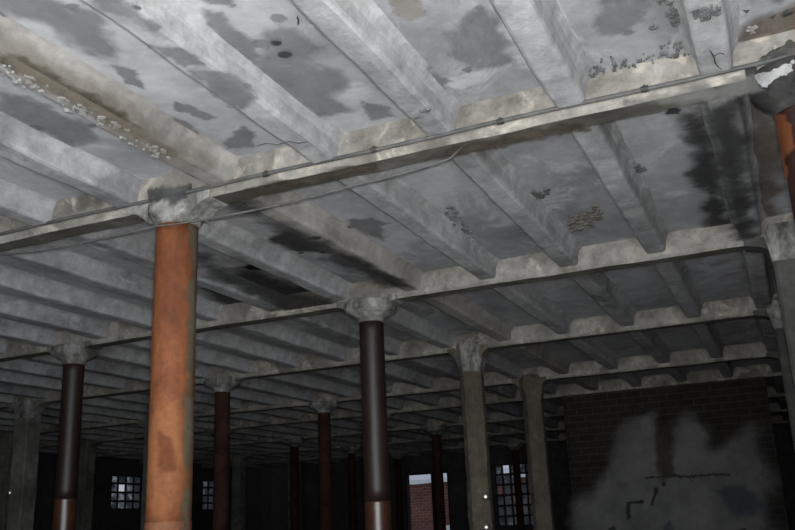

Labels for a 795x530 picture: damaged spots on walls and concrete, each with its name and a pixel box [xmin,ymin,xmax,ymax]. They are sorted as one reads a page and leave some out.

damp [0,0,161,55]
damp [112,66,143,88]
damp [149,46,254,109]
damp [205,0,347,115]
damp [391,0,423,19]
damp [453,5,512,72]
damp [596,0,647,35]
damp [657,0,680,27]
peeling [754,39,795,88]
damp [0,95,97,147]
damp [364,103,391,120]
damp [656,424,676,486]